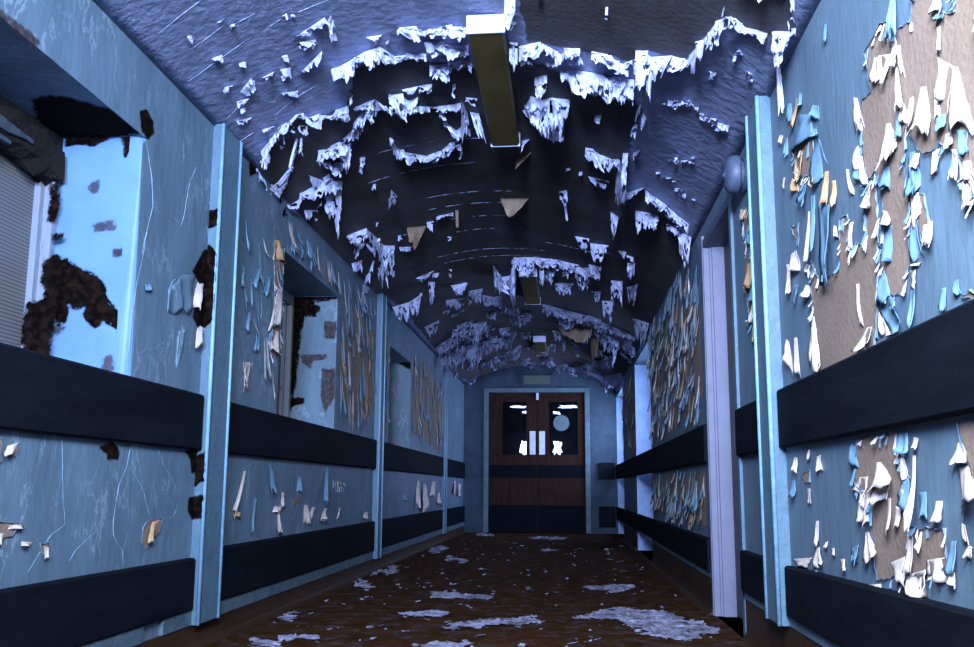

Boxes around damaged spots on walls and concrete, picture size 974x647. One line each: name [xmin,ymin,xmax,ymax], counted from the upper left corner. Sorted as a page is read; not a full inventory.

flaking render [208,208,219,228]
peeling [240,0,974,456]
flaking render [193,244,217,333]
peeling [0,437,20,463]
peeling [0,521,50,560]
peeling [141,518,163,550]
flaking render [186,449,206,519]
peeling [232,471,258,533]
peeling [270,463,346,535]
peeling [650,470,708,530]
peeling [788,417,974,598]